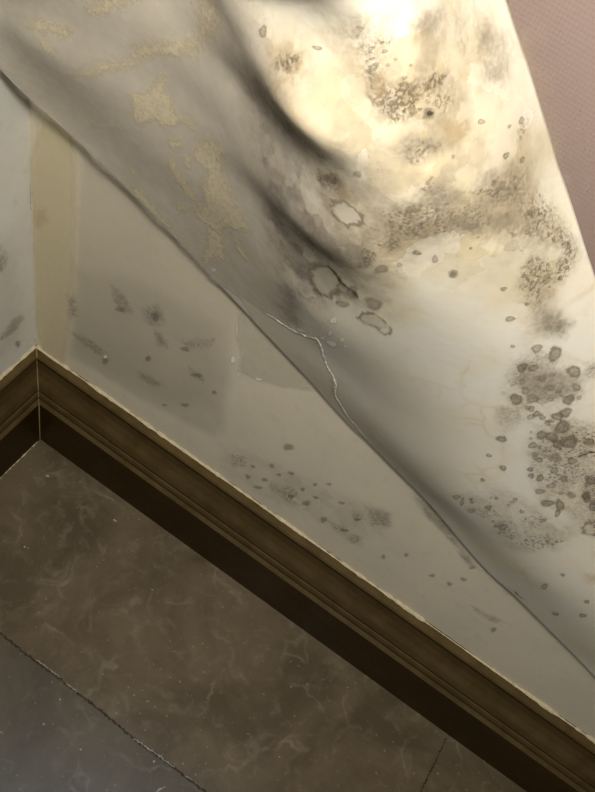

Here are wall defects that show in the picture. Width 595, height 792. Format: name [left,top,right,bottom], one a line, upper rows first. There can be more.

water stain [366,41,450,120]
water stain [0,0,327,326]
water stain [385,203,480,256]
water stain [523,202,572,298]
water stain [511,363,595,536]